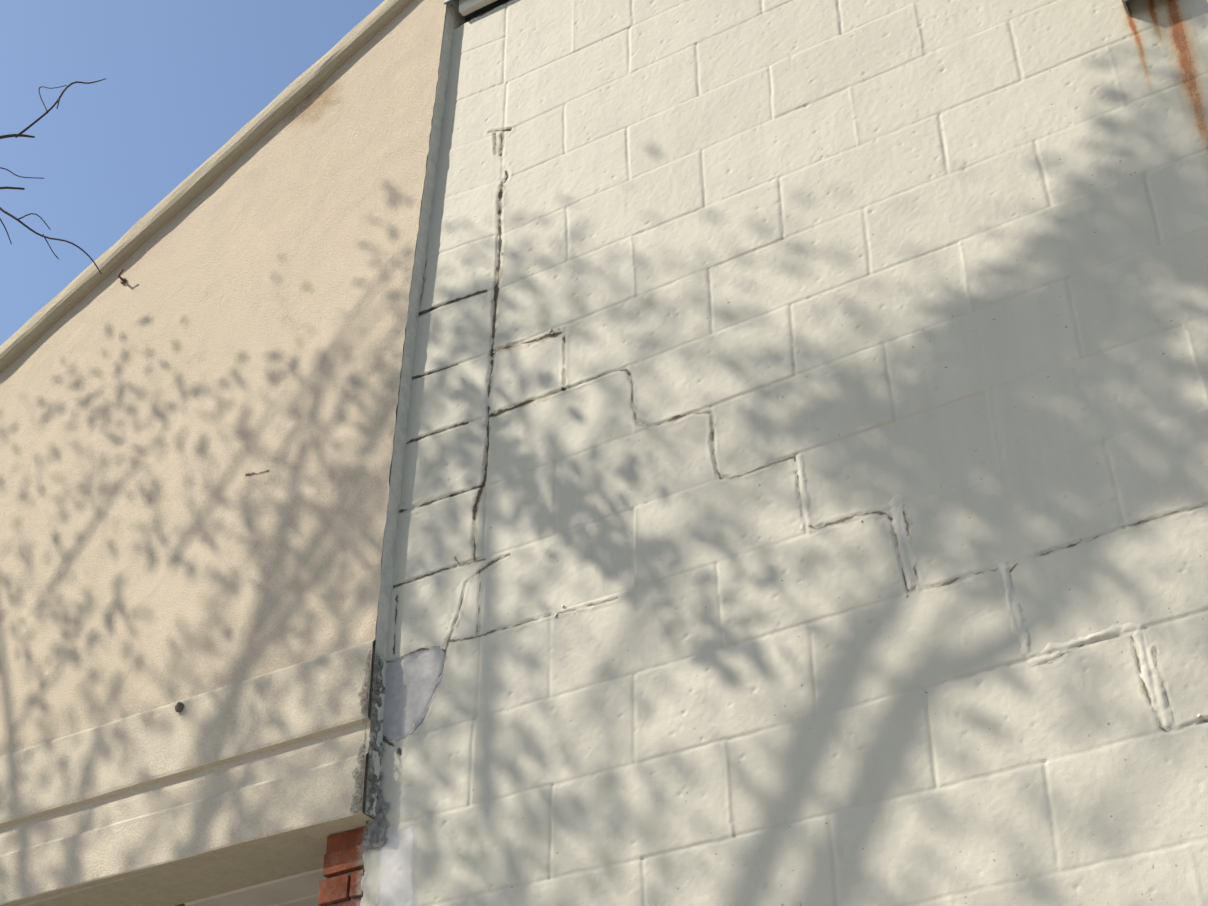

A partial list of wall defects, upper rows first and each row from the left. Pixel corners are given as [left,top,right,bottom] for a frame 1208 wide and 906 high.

corrosion [1123,3,1143,56]
corrosion [1148,0,1205,131]
crack [383,127,798,755]
crack [810,511,1078,597]
peeling [350,646,446,852]
crack [1131,636,1168,732]